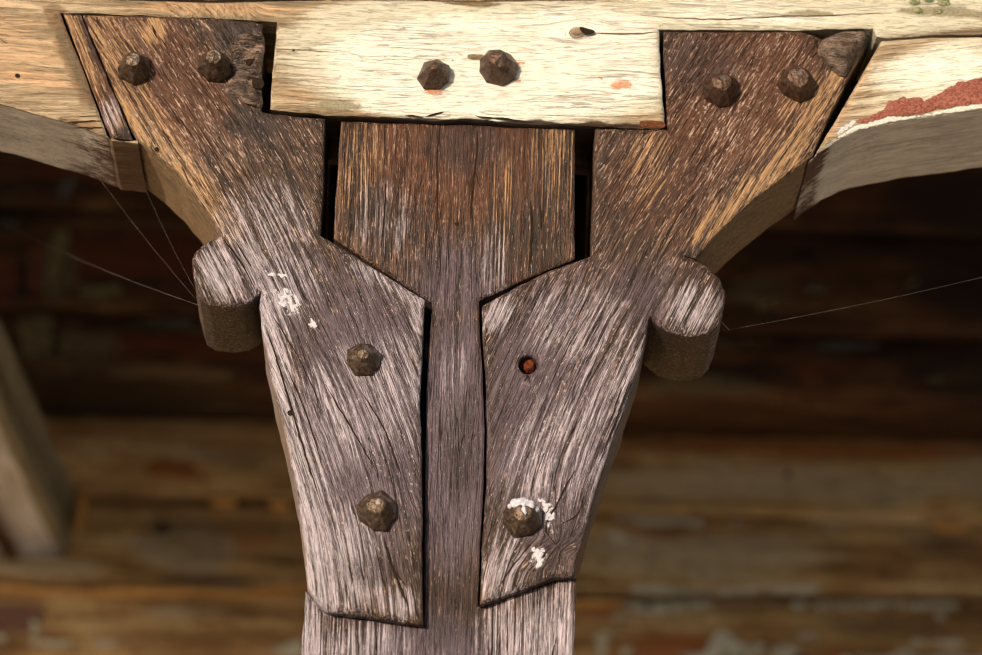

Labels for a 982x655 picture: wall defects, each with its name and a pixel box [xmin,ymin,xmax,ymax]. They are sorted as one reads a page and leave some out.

peeling [857,77,982,124]
peeling [682,629,822,655]